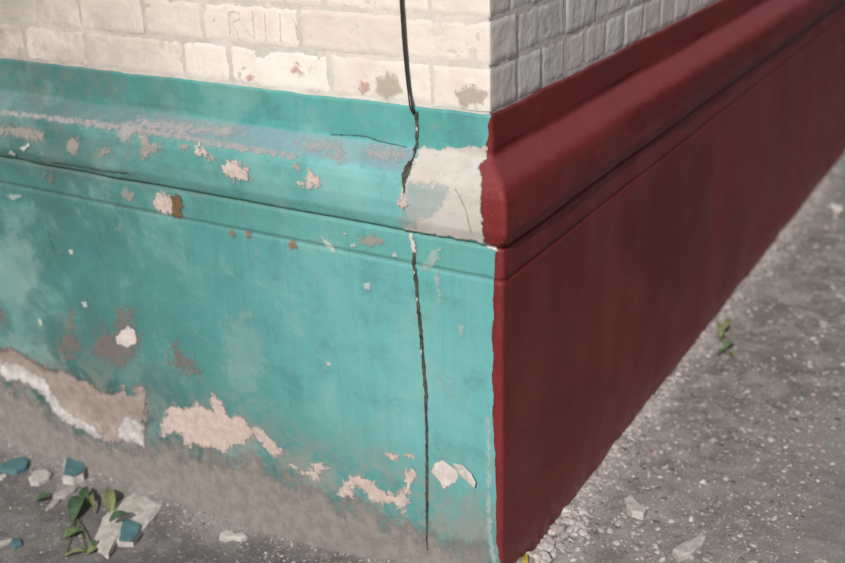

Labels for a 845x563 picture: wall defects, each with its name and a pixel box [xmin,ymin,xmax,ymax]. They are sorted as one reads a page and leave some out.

peeling [152,190,173,215]
peeling [0,108,346,189]
peeling [350,232,384,247]
crack [398,111,418,210]
flaking render [365,142,497,251]
peeling [423,247,442,305]
flaking render [0,344,149,447]
peeling [160,392,283,458]
crack [409,233,428,550]
damp [0,380,490,563]
peeling [289,461,330,483]
peeling [336,451,418,515]